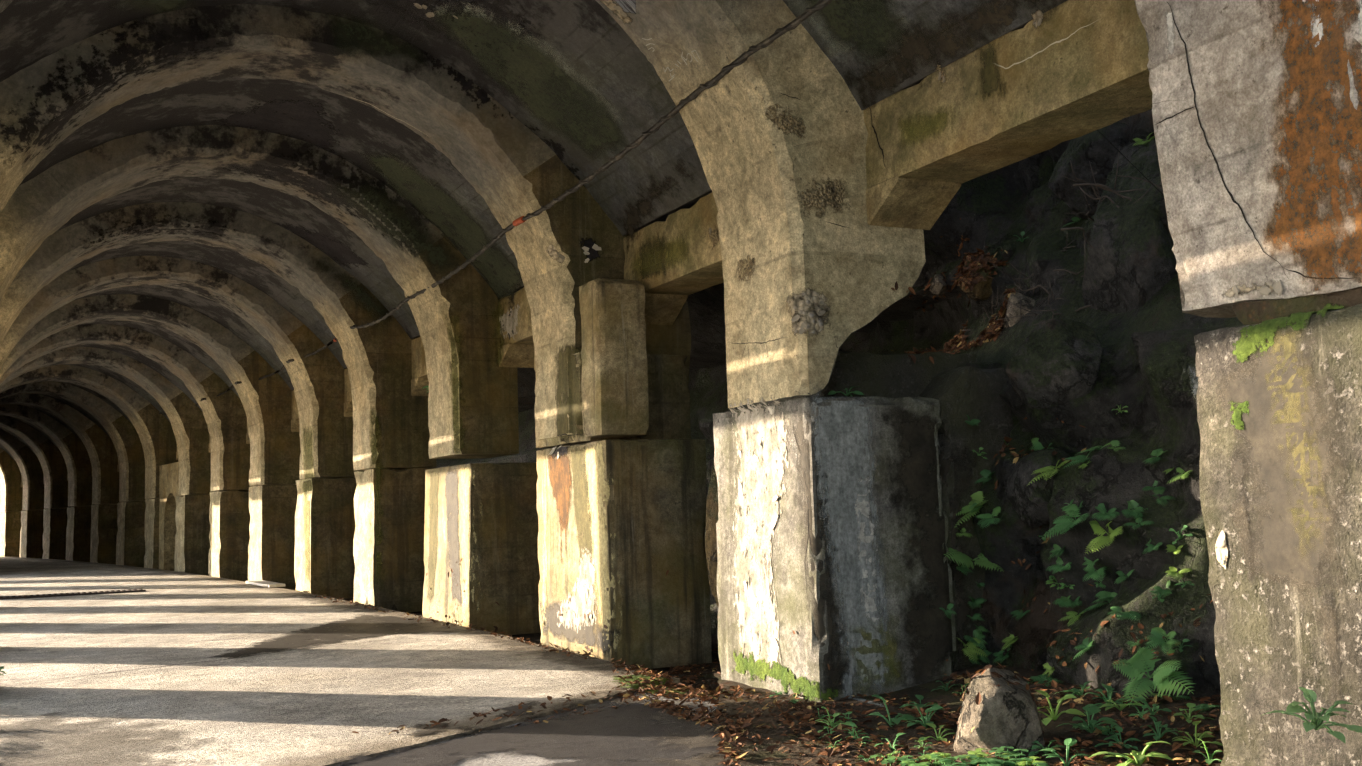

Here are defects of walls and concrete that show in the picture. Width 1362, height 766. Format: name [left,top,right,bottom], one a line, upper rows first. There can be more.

spalling [600,0,636,24]
damp [0,0,222,164]
crack [1135,2,1358,279]
damp [87,213,236,244]
corrosion [548,454,571,562]
peeling [557,549,597,634]
damp [793,394,986,707]